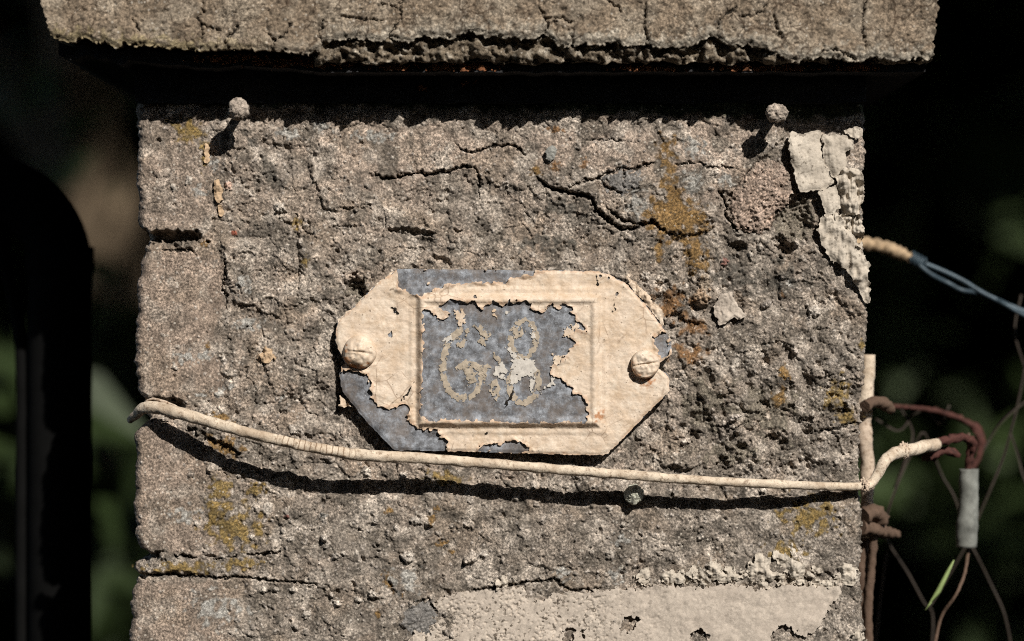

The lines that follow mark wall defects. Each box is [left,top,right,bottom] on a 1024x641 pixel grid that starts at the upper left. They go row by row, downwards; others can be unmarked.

crack [375,143,742,232]
peeling [773,126,871,304]
crack [147,550,316,585]
peeling [399,543,861,641]
peeling [850,629,867,641]